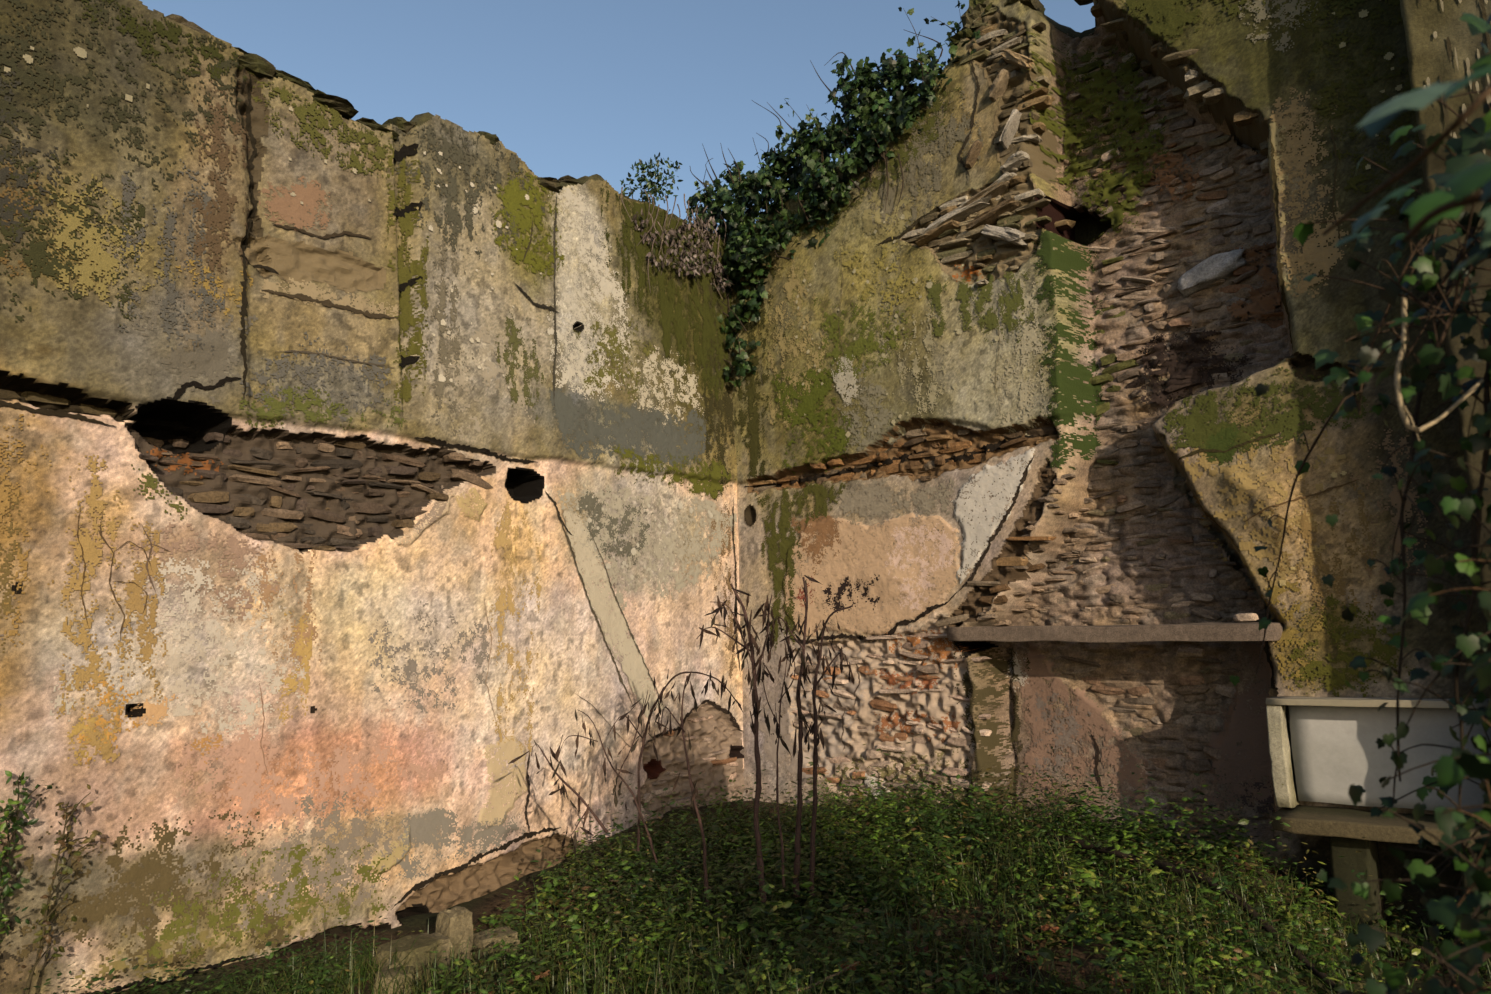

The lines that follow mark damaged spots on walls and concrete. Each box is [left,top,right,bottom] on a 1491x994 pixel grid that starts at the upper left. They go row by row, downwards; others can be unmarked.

crack [0,400,116,427]
damp [0,0,257,355]
damp [0,519,490,994]
spalling [0,370,496,554]
crack [149,73,423,414]
peeling [279,735,583,950]
peeling [546,186,737,717]
damp [688,246,829,679]
peeling [633,416,1059,819]
damp [822,574,880,613]
damp [837,309,950,460]
spalling [897,5,1076,286]